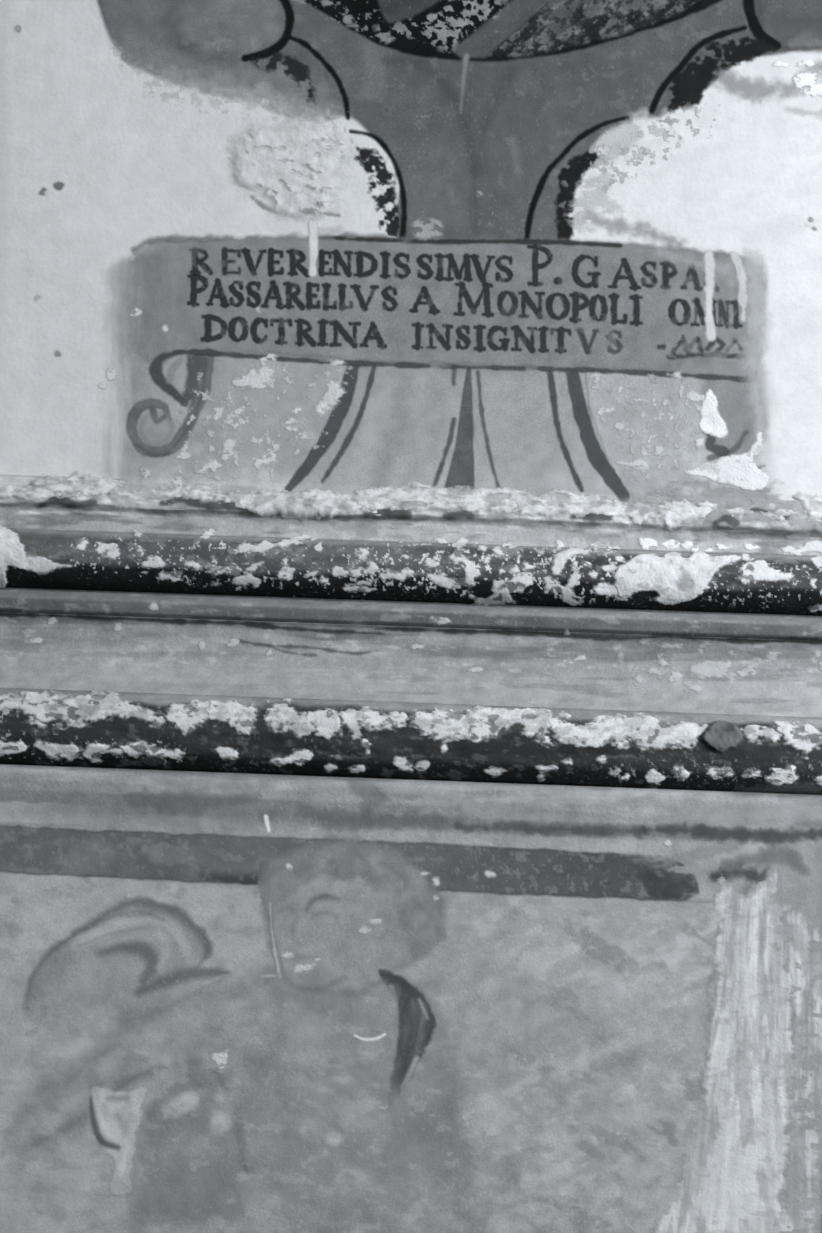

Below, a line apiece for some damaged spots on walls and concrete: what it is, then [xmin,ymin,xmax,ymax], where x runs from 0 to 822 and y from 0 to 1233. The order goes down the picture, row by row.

peeling [292,0,506,50]
spalling [717,60,822,97]
peeling [572,106,715,245]
peeling [0,354,822,612]
peeling [634,654,756,693]
peeling [0,689,822,786]